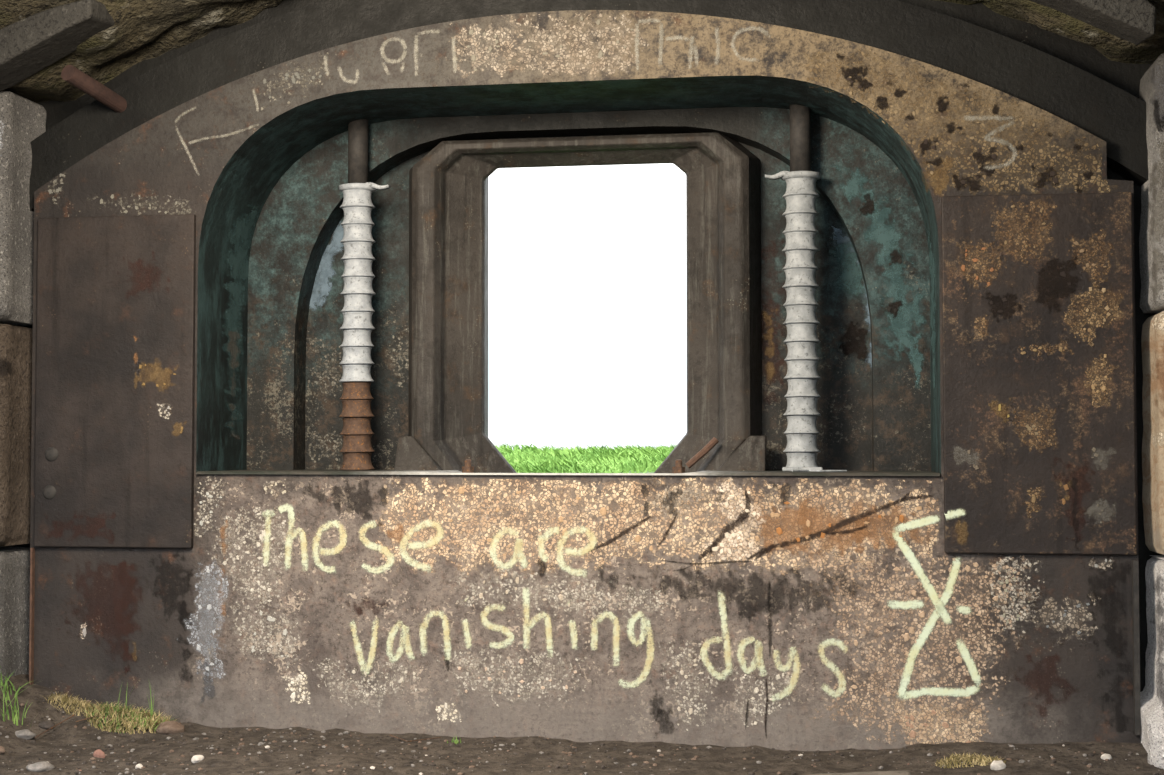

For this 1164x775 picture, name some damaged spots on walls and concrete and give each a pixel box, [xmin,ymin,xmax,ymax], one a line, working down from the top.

crack [589,491,930,571]
rust [755,500,917,555]
water stain [1153,576,1164,706]